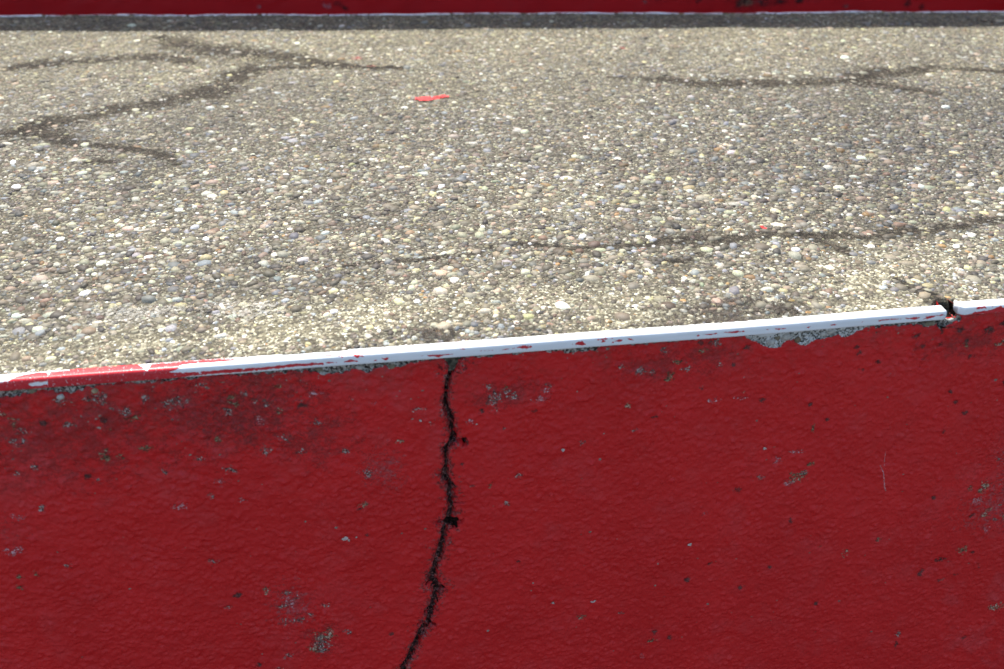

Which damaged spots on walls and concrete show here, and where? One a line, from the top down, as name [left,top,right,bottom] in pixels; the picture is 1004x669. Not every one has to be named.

spalling [735,300,962,350]
spalling [464,346,607,358]
spalling [0,359,433,405]
crack [396,335,475,669]